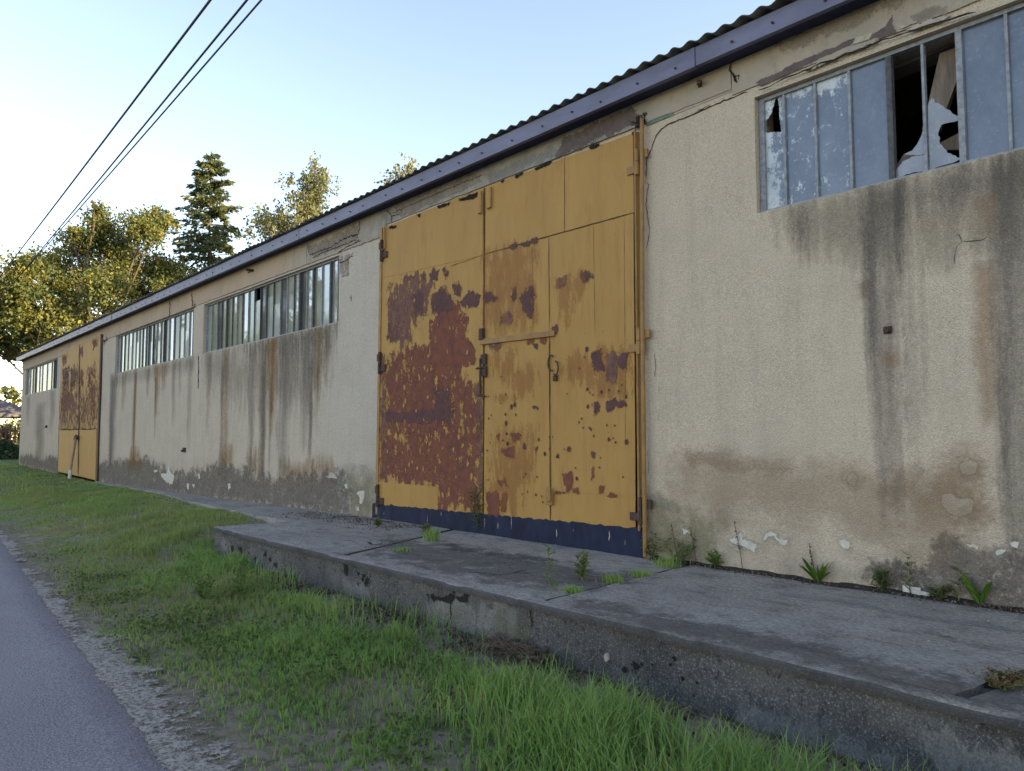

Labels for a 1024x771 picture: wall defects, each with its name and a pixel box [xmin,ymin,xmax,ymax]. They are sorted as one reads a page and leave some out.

spalling [756,0,975,90]
crack [645,64,746,244]
corrosion [499,285,536,325]
corrosion [58,338,99,437]
corrosion [379,267,508,517]
corrosion [496,393,571,458]
corrosion [578,347,629,445]
flaking render [97,455,365,513]
corrosion [527,451,617,503]
peeling [729,531,788,552]
flaking render [866,533,1024,608]
spalling [426,591,477,637]